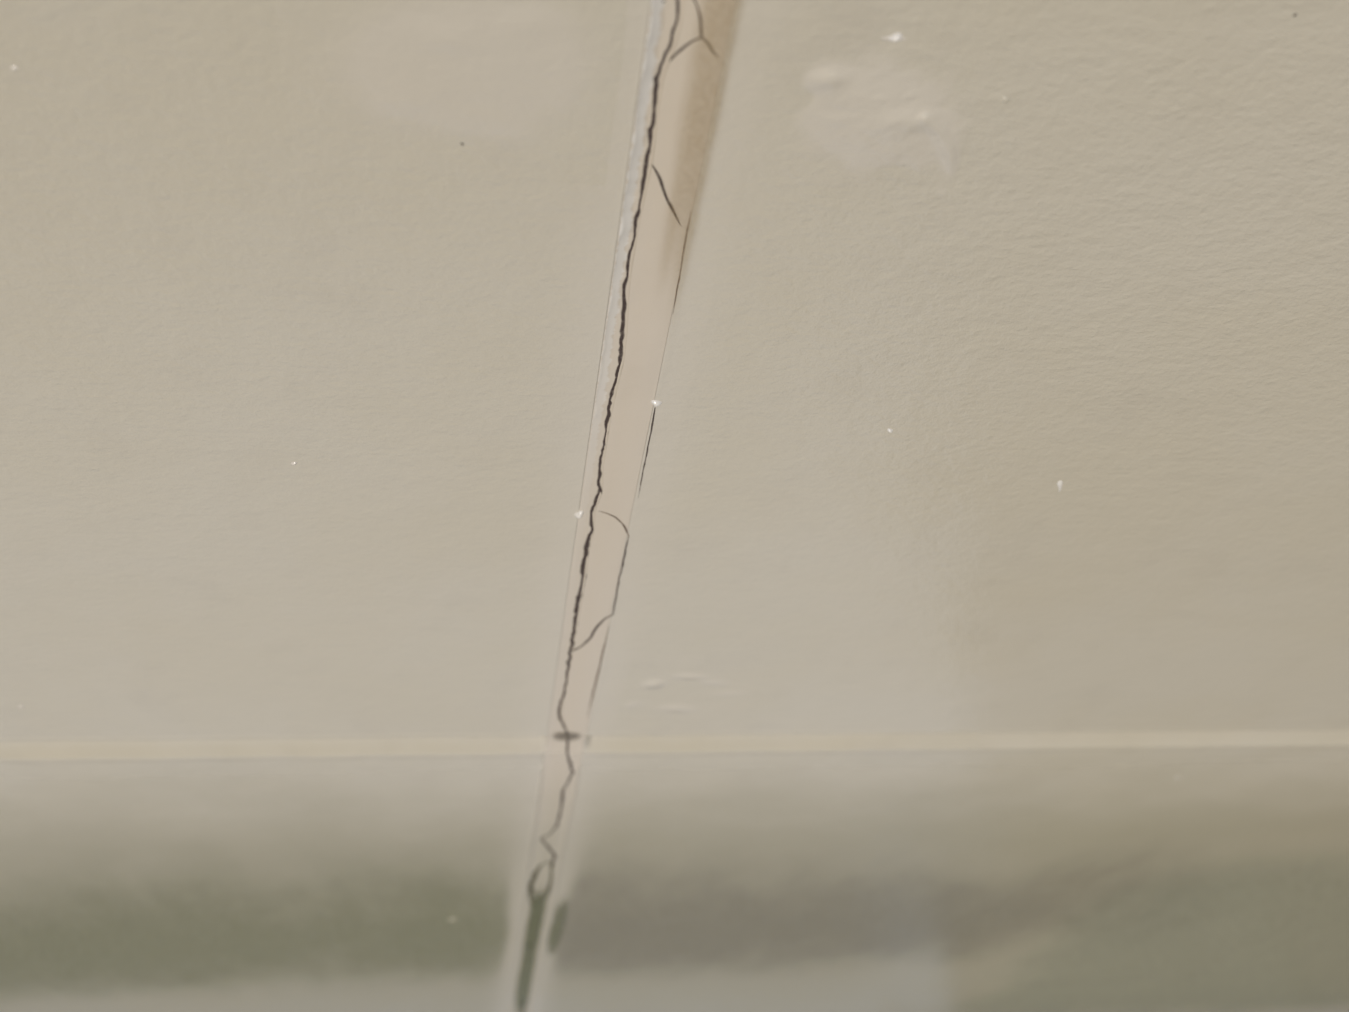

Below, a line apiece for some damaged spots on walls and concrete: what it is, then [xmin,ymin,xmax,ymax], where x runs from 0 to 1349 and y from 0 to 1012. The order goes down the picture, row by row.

crack [528,0,719,906]